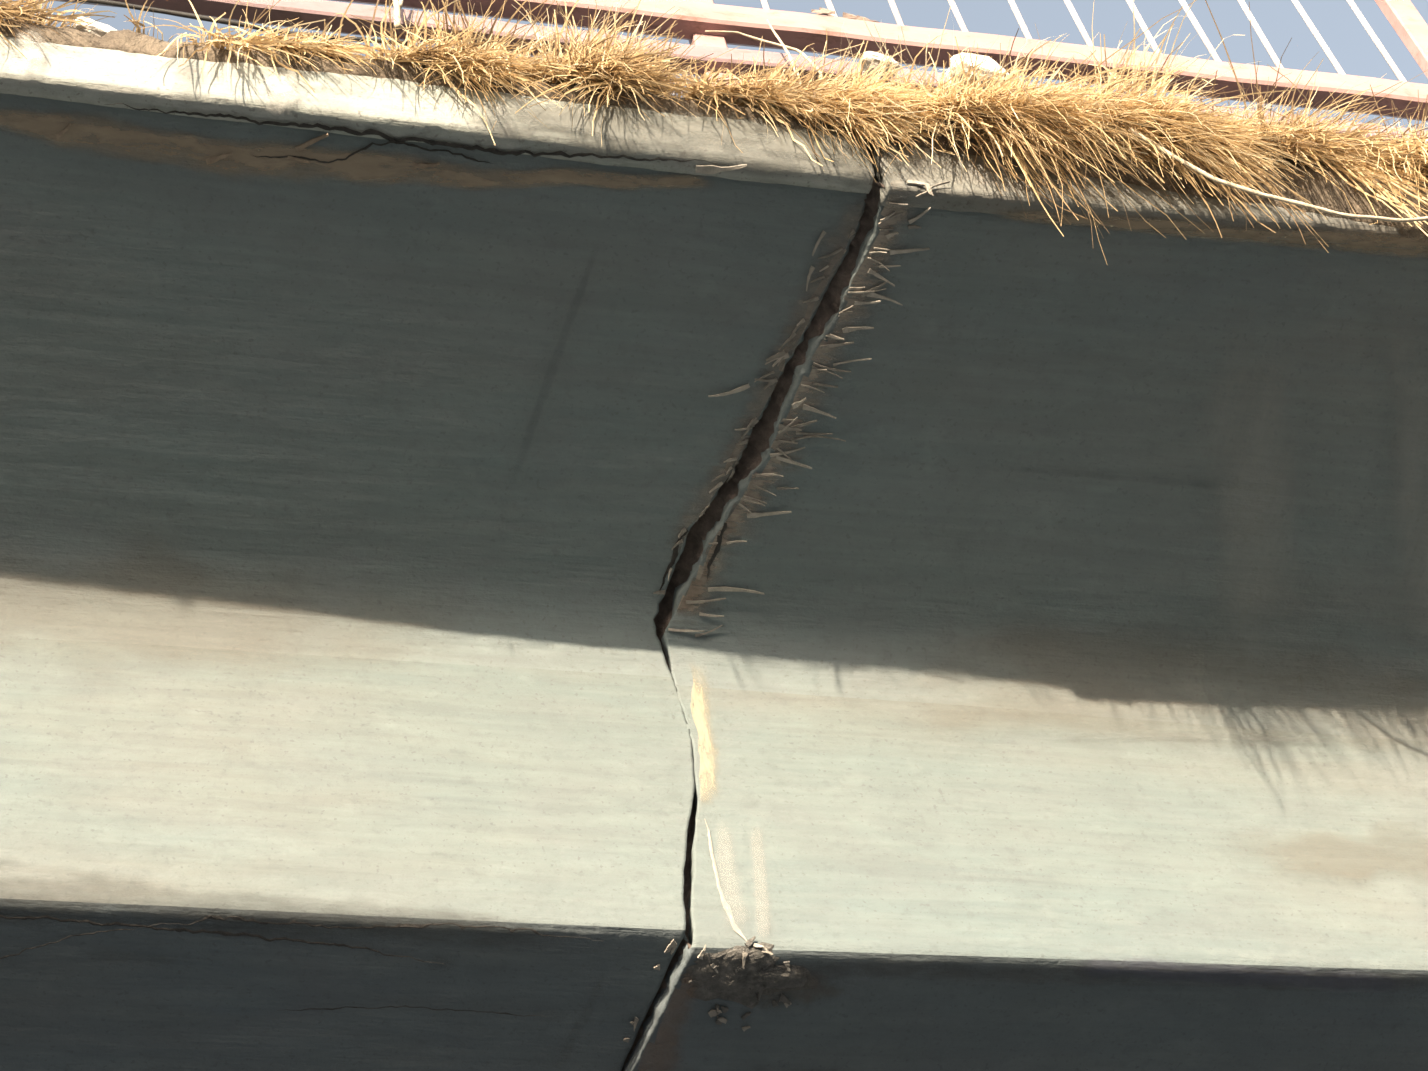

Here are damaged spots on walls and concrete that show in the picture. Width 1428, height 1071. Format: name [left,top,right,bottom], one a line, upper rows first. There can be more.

crack [621,179,950,1071]
crack [0,915,599,964]
spalling [680,936,818,1031]